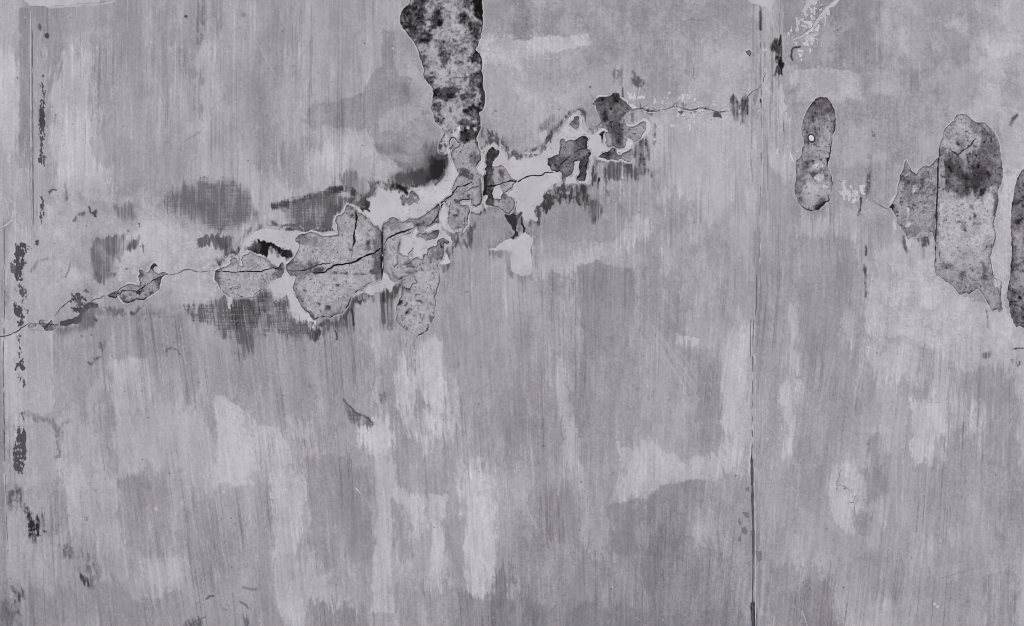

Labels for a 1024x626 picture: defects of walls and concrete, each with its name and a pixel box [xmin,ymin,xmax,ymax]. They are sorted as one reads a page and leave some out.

flaking render [104,261,170,305]
crack [0,76,765,337]
flaking render [210,0,651,339]
flaking render [793,95,860,213]
flaking render [888,113,1024,330]